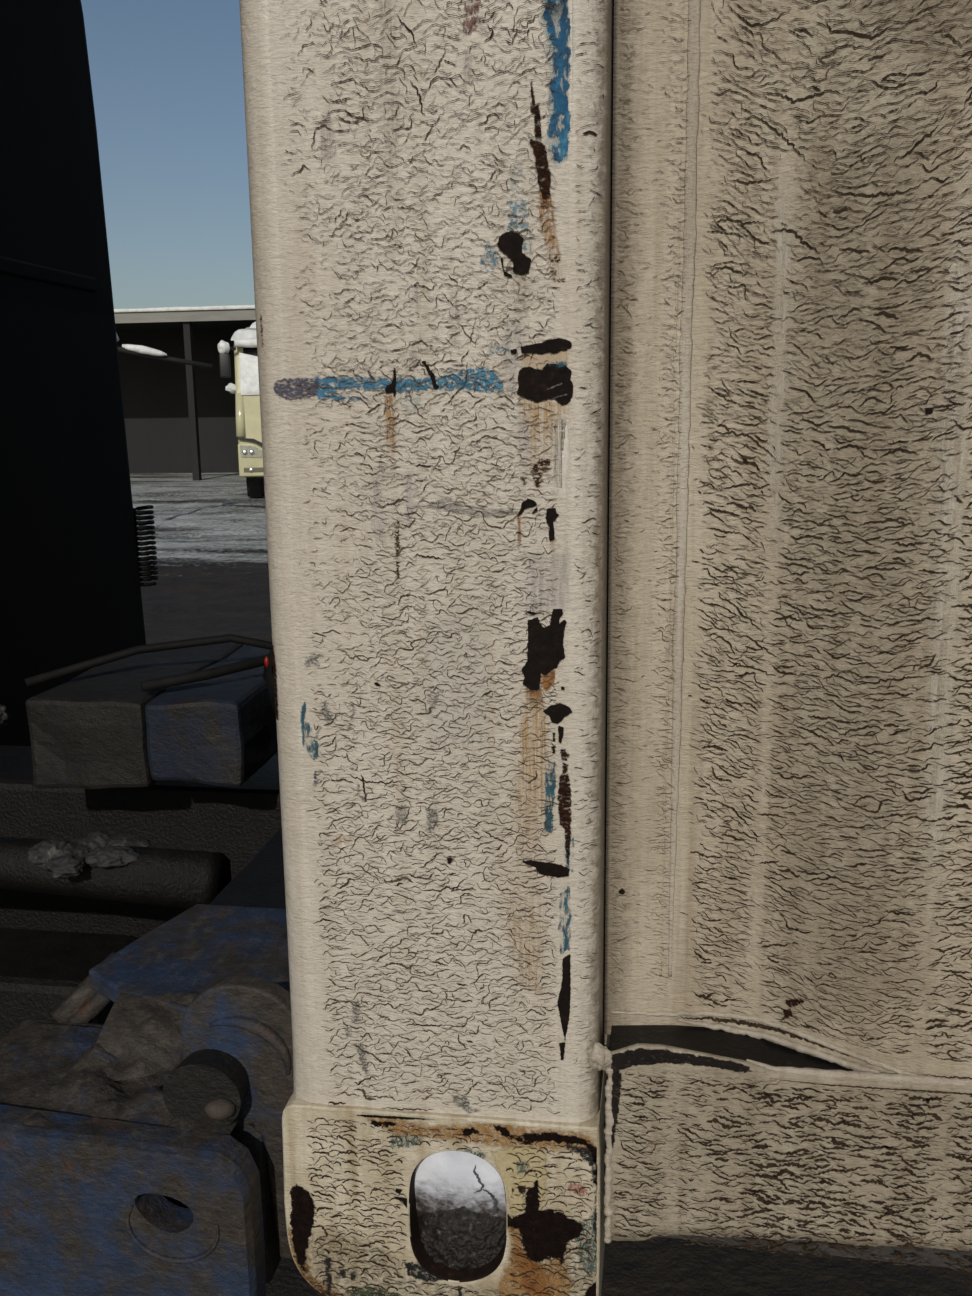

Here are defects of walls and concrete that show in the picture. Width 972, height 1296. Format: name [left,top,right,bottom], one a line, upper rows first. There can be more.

corrosion [539,191,565,282]
peeling [490,338,574,405]
peeling [518,498,559,541]
peeling [521,609,567,690]
corrosion [522,670,555,782]
peeling [543,687,572,774]
corrosion [557,774,572,864]
peeling [522,860,570,878]
peeling [507,1173,583,1265]
corrosion [499,1227,596,1296]